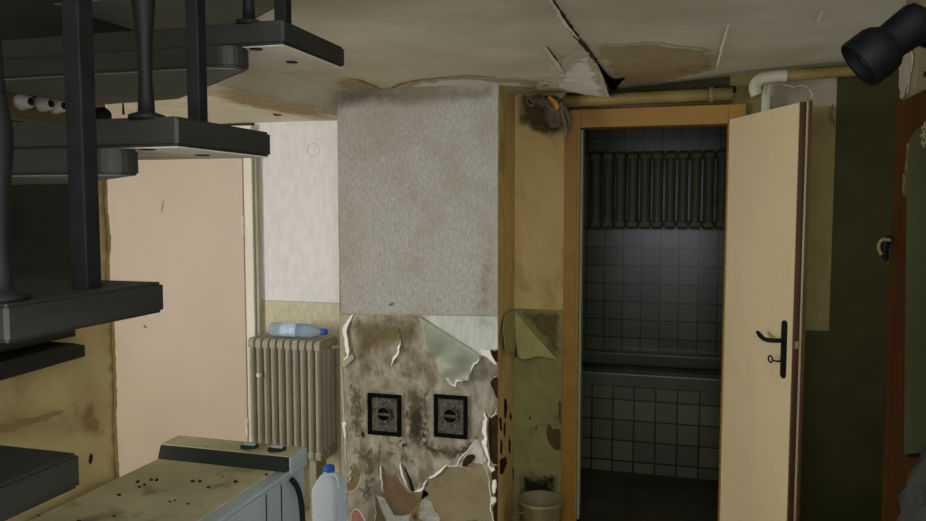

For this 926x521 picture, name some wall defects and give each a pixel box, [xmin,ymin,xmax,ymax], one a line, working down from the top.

crack [544,46,565,76]
crack [549,0,603,69]
crack [717,23,730,67]
peeling [342,370,361,493]
spalling [350,370,514,521]